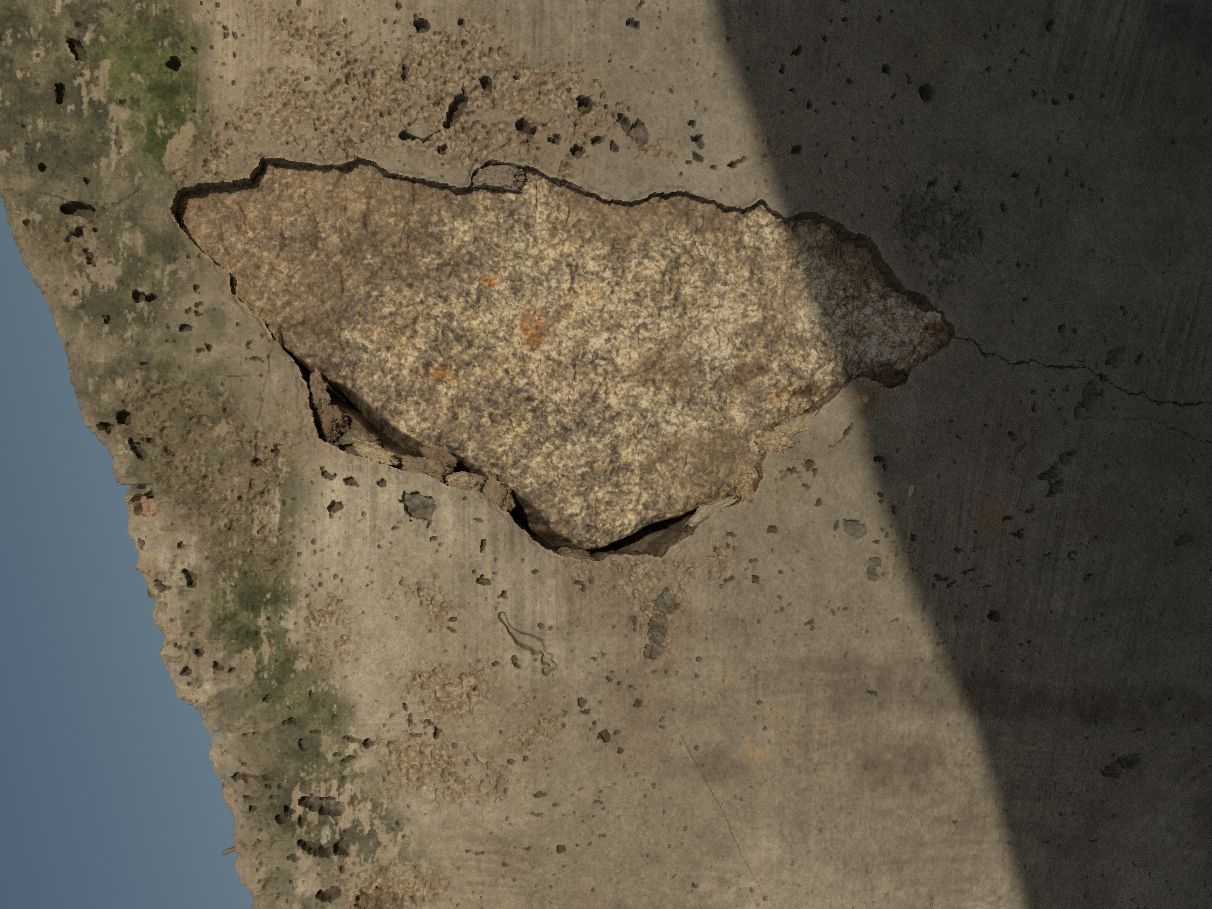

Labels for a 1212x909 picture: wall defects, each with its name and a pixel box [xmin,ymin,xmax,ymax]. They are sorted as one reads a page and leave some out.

spalling [170,156,989,561]
crack [953,336,1212,444]
spalling [833,517,889,581]